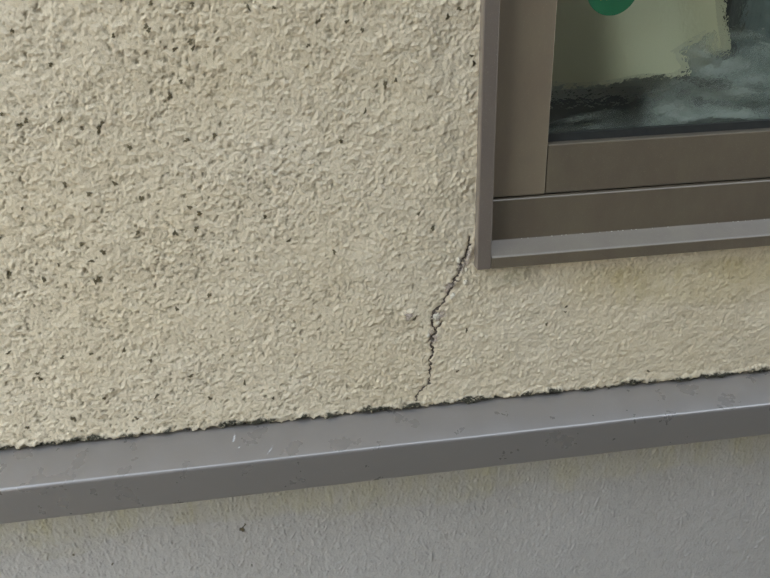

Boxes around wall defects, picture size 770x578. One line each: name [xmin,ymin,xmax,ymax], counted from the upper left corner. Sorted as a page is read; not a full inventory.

crack [415,236,472,401]